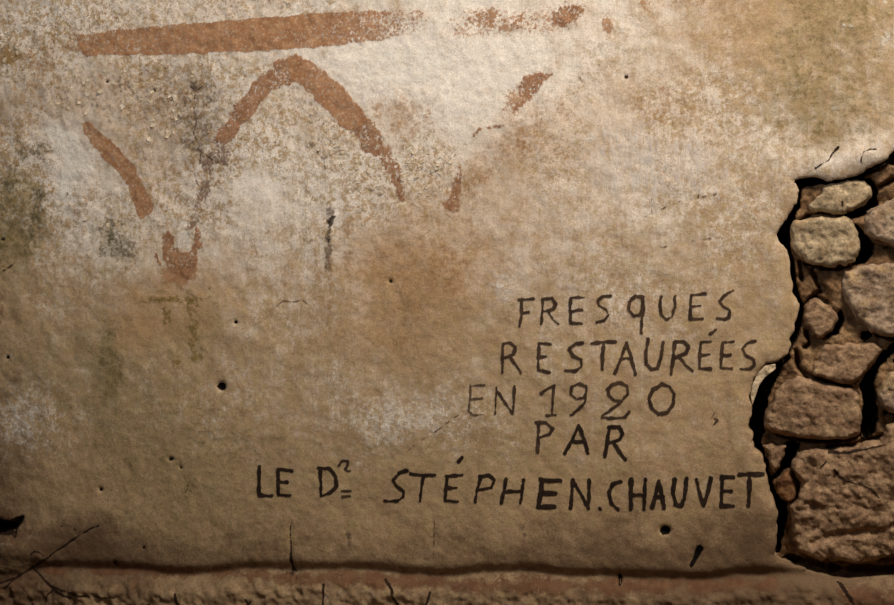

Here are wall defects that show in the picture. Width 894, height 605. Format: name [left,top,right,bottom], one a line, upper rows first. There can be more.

crack [0,524,121,602]
spalling [751,163,894,576]